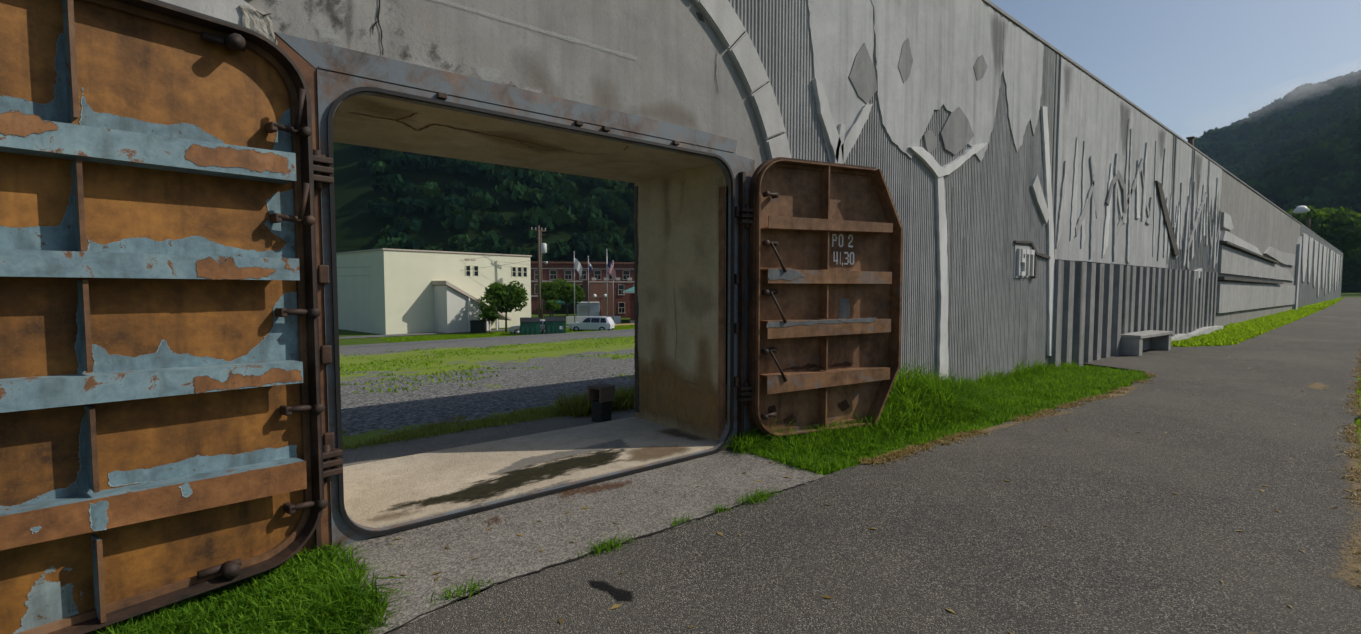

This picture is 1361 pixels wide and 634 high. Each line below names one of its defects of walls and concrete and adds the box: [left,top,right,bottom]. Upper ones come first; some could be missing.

spalling [239,5,278,45]
crack [372,0,384,55]
peeling [0,33,225,144]
peeling [273,108,292,153]
peeling [0,170,295,258]
peeling [74,292,299,374]
corrosion [782,361,852,371]
peeling [0,416,297,531]
peeling [14,566,83,634]